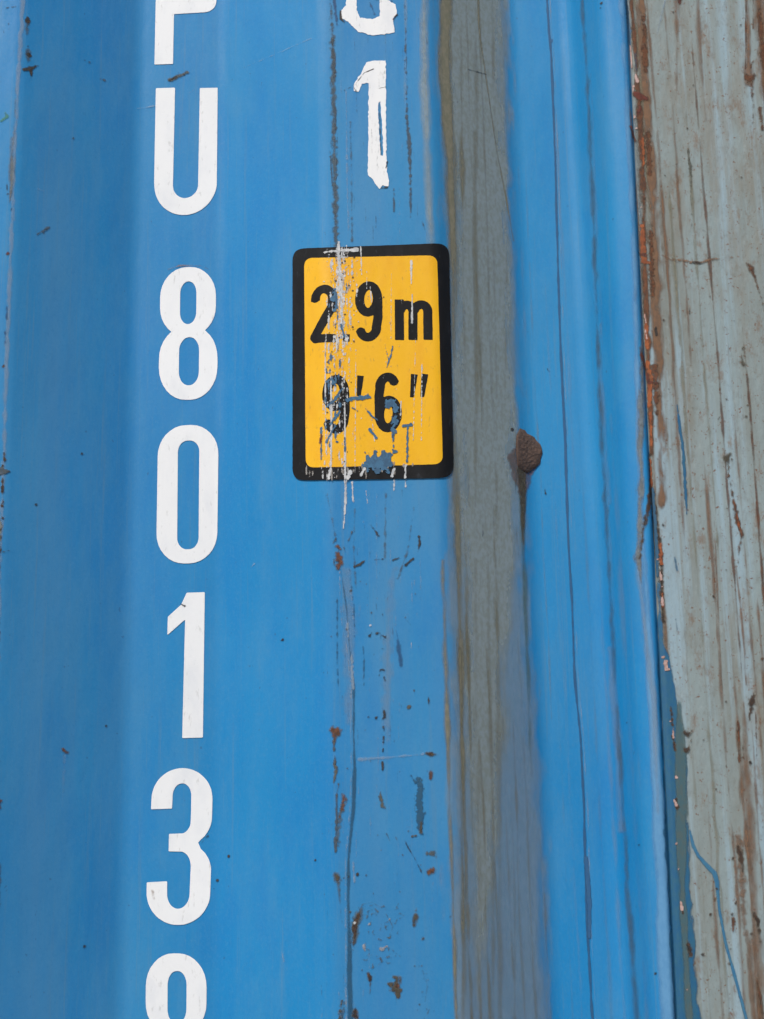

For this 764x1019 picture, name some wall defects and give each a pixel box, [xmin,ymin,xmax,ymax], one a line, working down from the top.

rust [740,0,764,130]
peeling [306,241,423,483]
rust [625,0,686,671]
rust [741,347,754,451]
rust [706,489,718,604]
rust [723,453,744,598]
rust [329,727,347,852]
rust [731,658,764,1019]
rust [352,913,360,945]
rust [387,976,402,998]